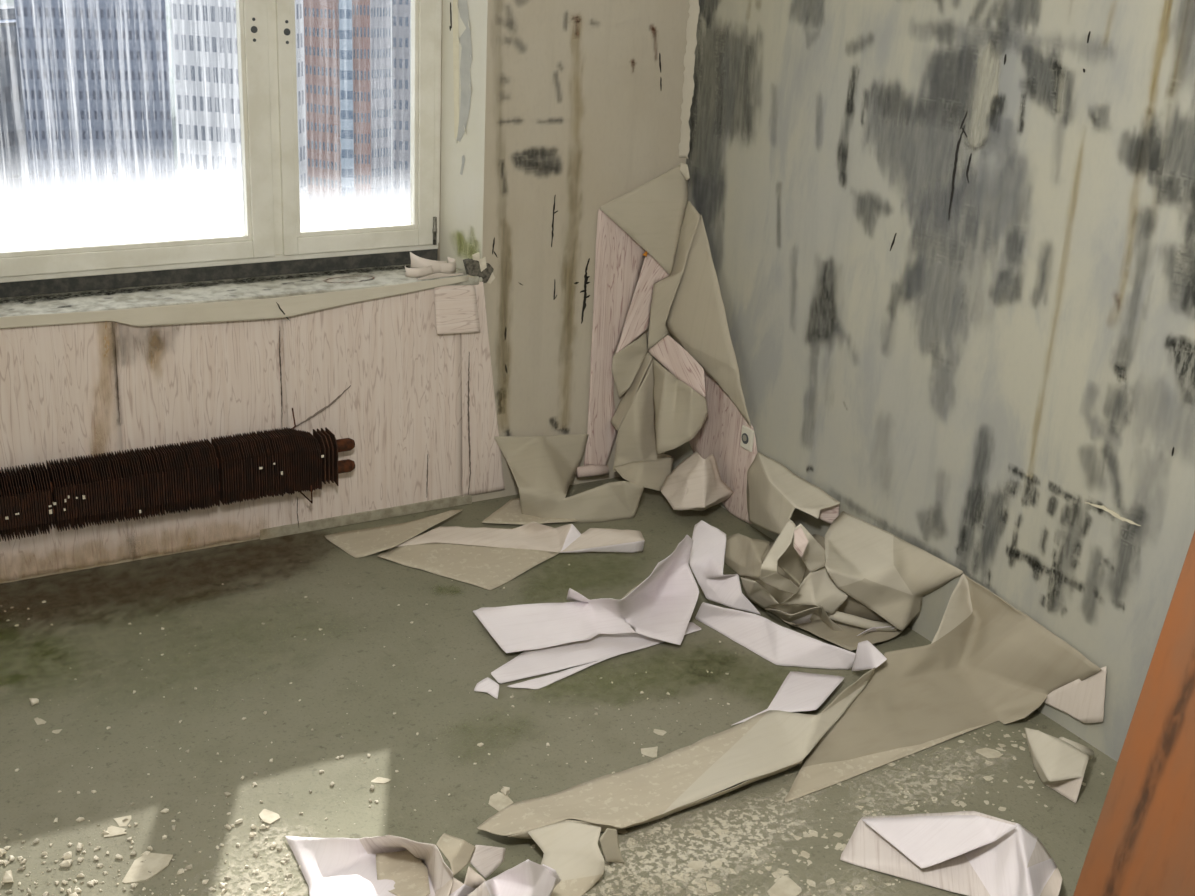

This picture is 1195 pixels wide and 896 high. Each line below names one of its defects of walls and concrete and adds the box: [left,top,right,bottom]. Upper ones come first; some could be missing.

peeling [449,0,473,175]
damp [502,151,559,175]
damp [690,0,749,209]
damp [847,72,855,113]
damp [868,50,981,251]
damp [990,97,1005,129]
damp [1020,47,1071,132]
damp [808,261,835,341]
damp [1166,340,1195,400]
damp [957,444,1105,610]
damp [1106,511,1143,607]